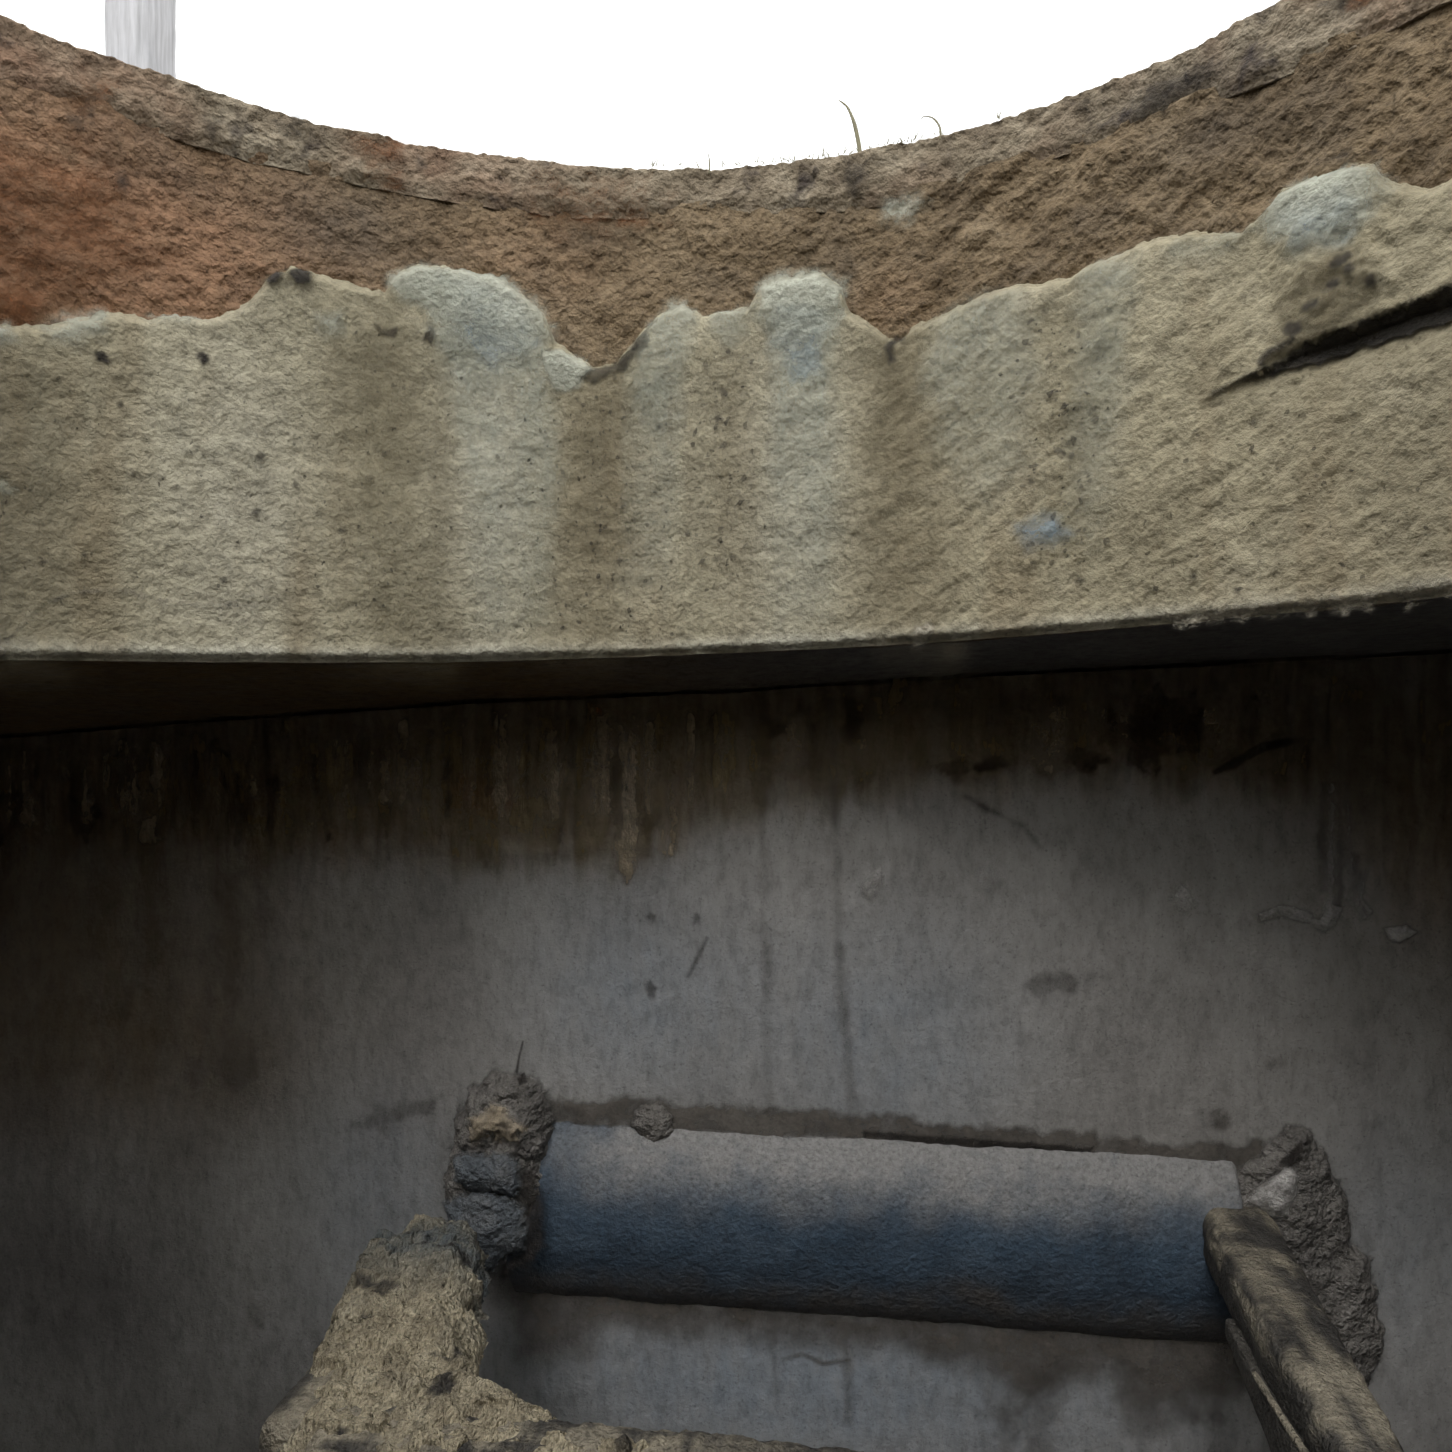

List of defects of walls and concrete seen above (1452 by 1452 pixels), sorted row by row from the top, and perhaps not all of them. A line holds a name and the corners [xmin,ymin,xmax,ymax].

spalling [267,268,311,283]
spalling [1283,251,1375,337]
peeling [90,351,110,369]
peeling [355,325,435,353]
spalling [690,385,744,457]
peeling [1250,1166,1299,1218]